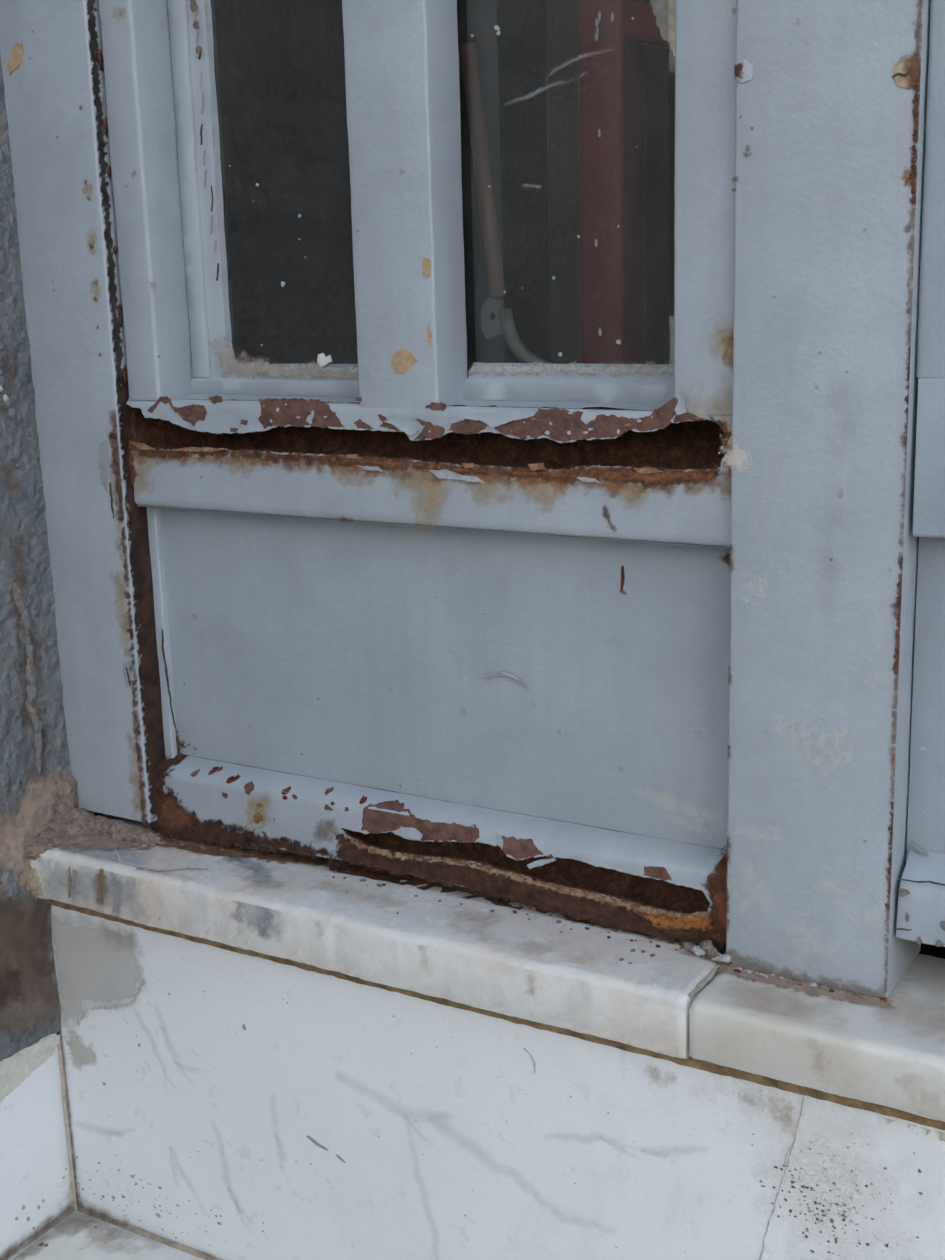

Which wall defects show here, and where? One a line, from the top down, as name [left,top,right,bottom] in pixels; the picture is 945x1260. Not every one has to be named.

peeling [6,42,25,75]
peeling [892,55,921,89]
peeling [422,258,431,281]
peeling [391,348,418,374]
spalling [129,393,727,483]
corrosion [884,0,923,993]
corrosion [99,378,749,964]
peeling [190,766,265,824]
crack [759,1095,804,1260]